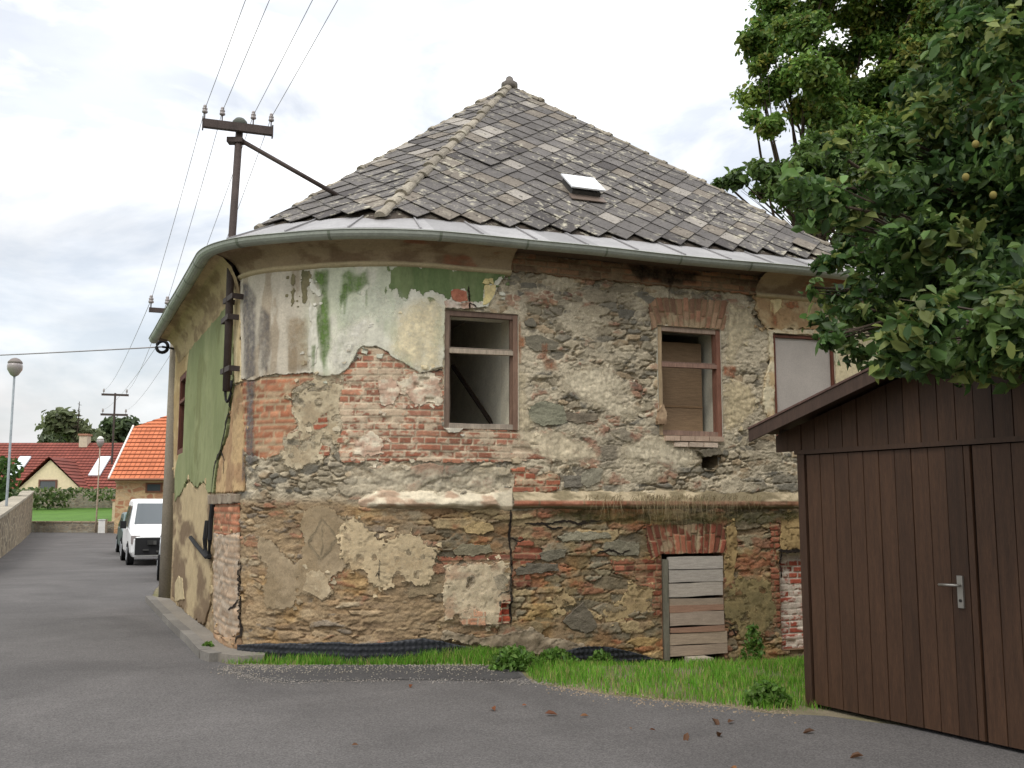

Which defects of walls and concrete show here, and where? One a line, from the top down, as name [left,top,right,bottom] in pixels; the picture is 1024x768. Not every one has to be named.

peeling [172,266,596,632]
crack [228,565,243,644]
crack [498,510,602,627]
spalling [597,558,662,626]
peeling [723,509,800,641]